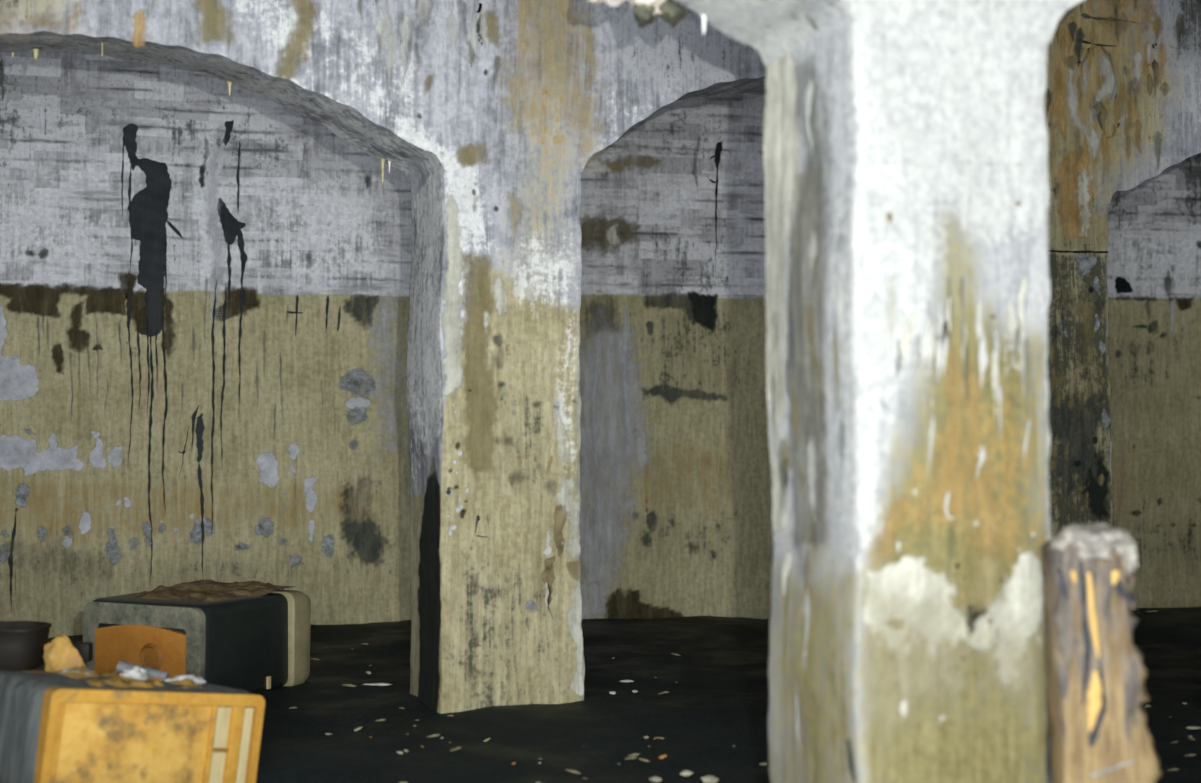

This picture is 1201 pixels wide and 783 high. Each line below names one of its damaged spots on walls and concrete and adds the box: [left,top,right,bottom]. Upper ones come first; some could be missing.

rust [1045,0,1167,136]
rust [1060,73,1140,238]
peeling [0,306,39,401]
damp [0,140,183,578]
damp [192,131,260,573]
damp [326,295,401,394]
damp [1048,253,1193,518]
damp [8,513,16,610]
peeling [0,429,123,507]
damp [343,489,387,563]
damp [418,472,441,712]
damp [967,555,1000,608]